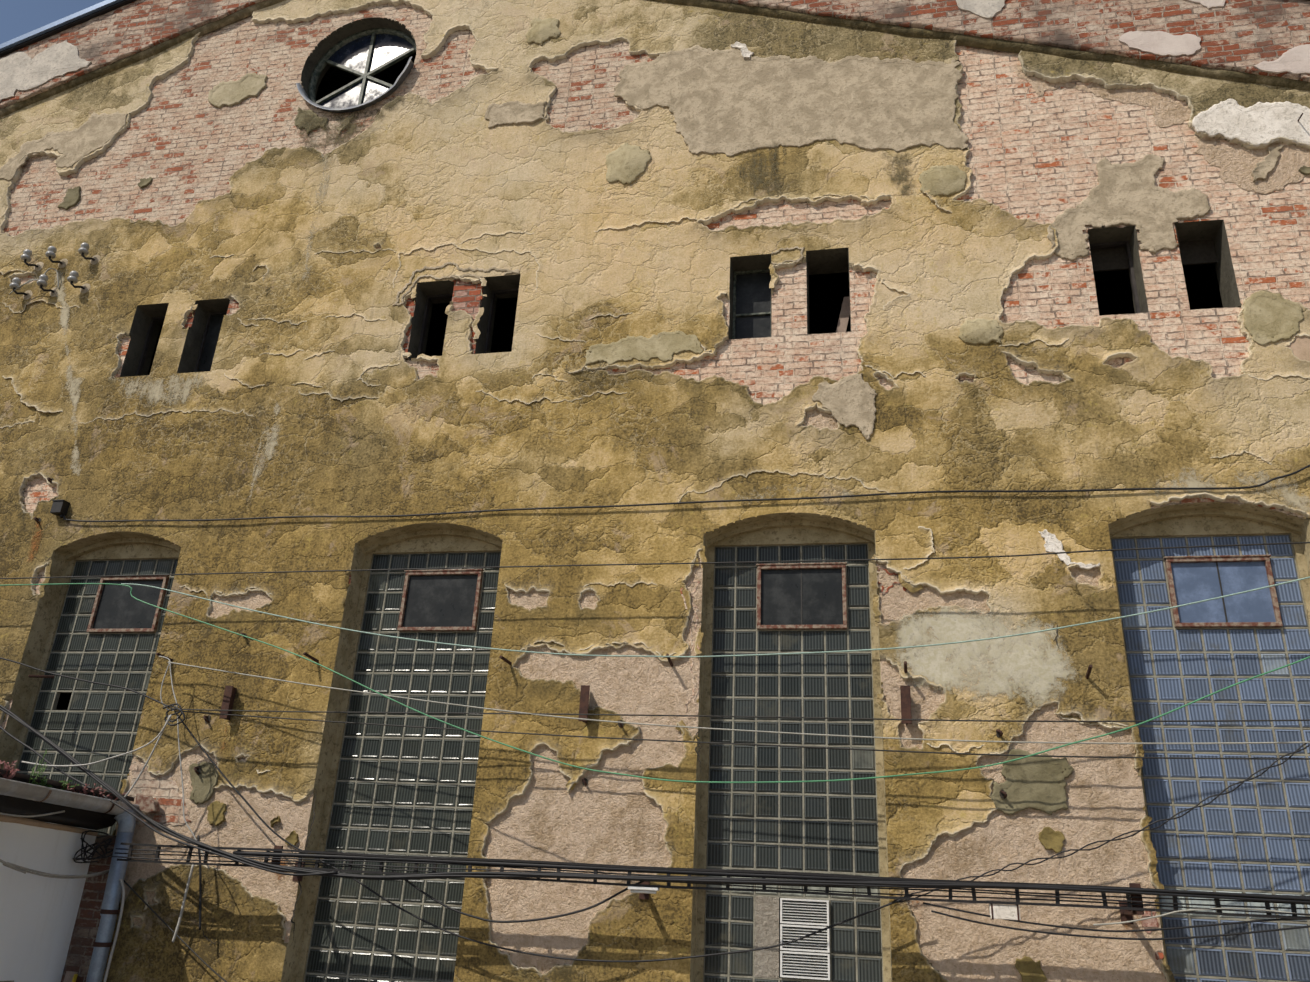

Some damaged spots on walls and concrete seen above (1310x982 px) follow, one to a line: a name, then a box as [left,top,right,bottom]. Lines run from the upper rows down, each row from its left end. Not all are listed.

flaking render [0,0,500,239]
flaking render [475,257,926,433]
peeling [731,42,754,59]
flaking render [924,40,1310,388]
flaking render [478,546,707,980]
flaking render [876,655,1176,982]